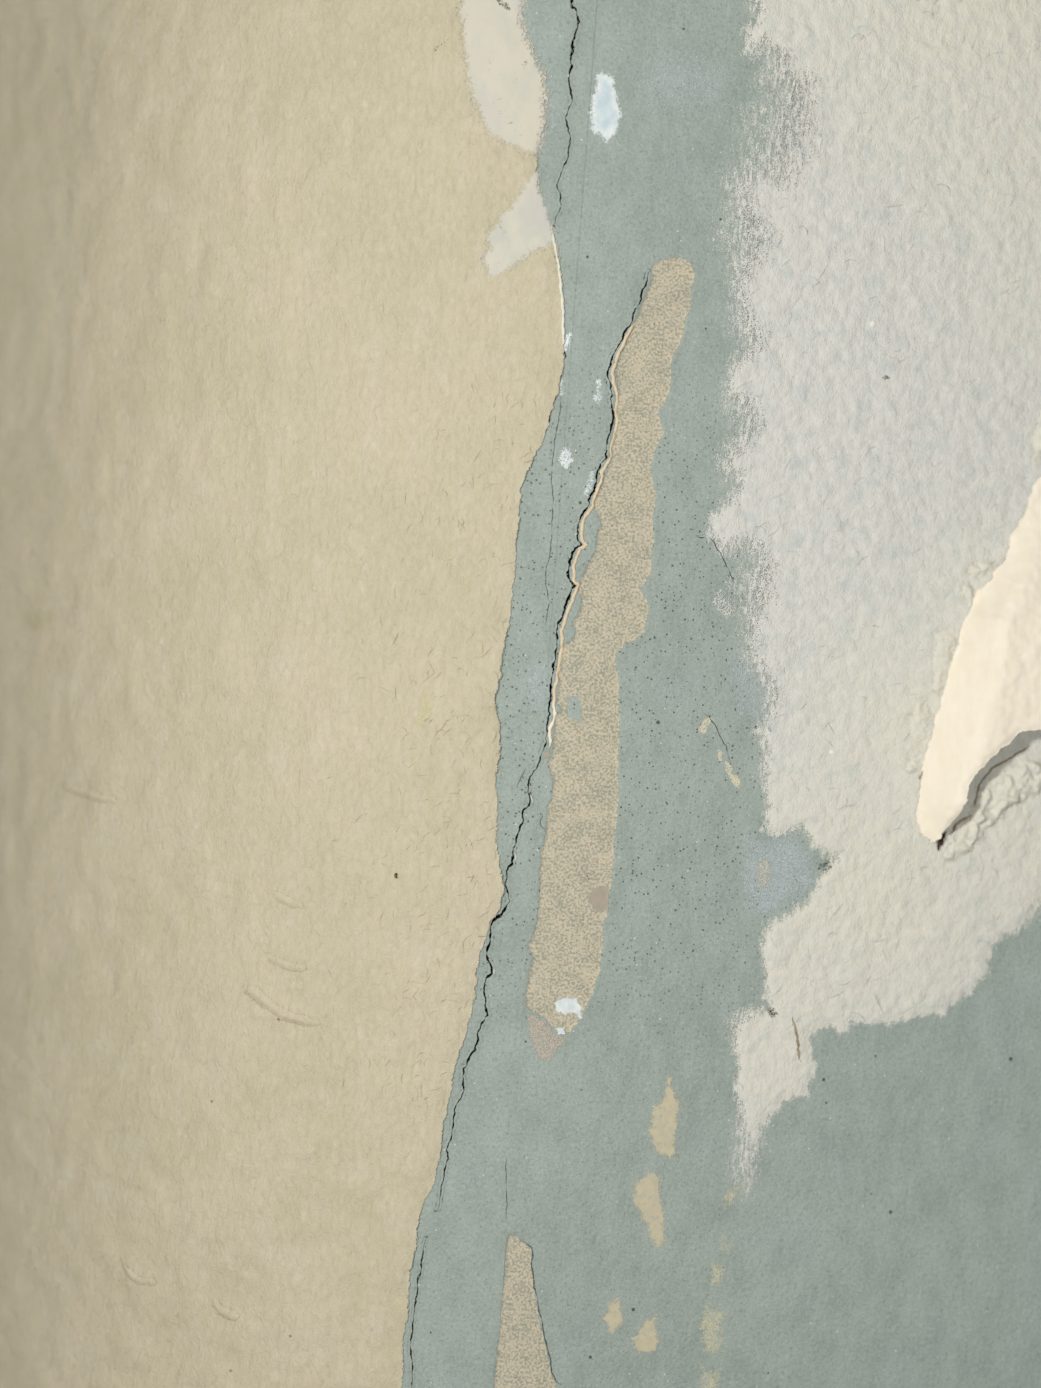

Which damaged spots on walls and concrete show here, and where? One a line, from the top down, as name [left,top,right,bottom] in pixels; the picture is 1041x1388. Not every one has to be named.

flaking render [525,256,695,1035]
crack [407,270,652,1388]
flaking render [648,1076,680,1159]
flaking render [632,1172,666,1249]
flaking render [494,1235,557,1388]
flaking render [601,1297,660,1354]